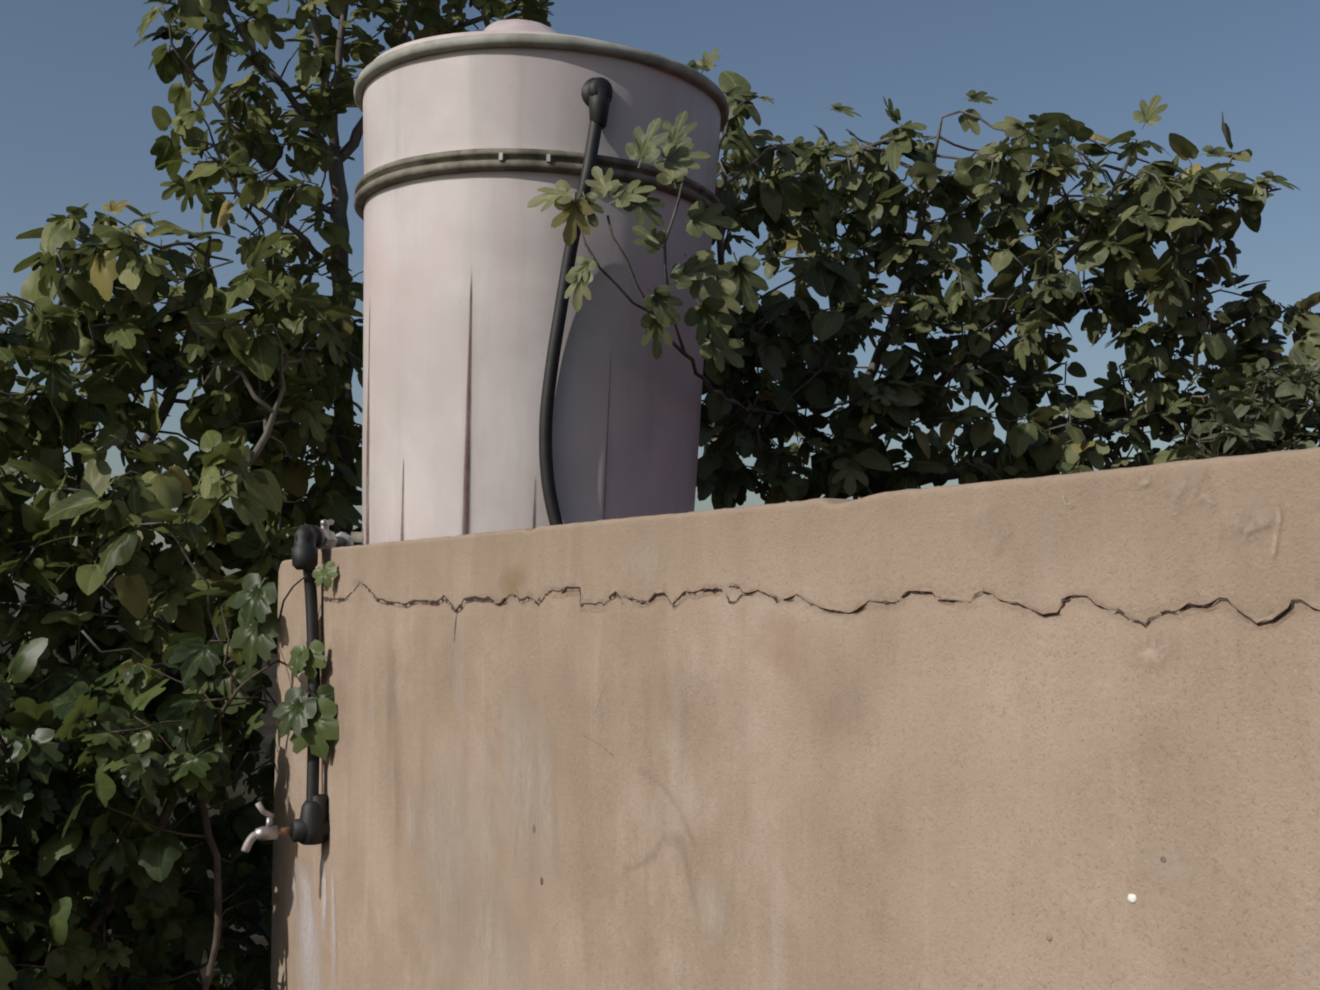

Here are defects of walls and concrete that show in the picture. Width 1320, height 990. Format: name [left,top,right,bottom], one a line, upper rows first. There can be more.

crack [320,582,1320,685]
crack [318,759,326,794]